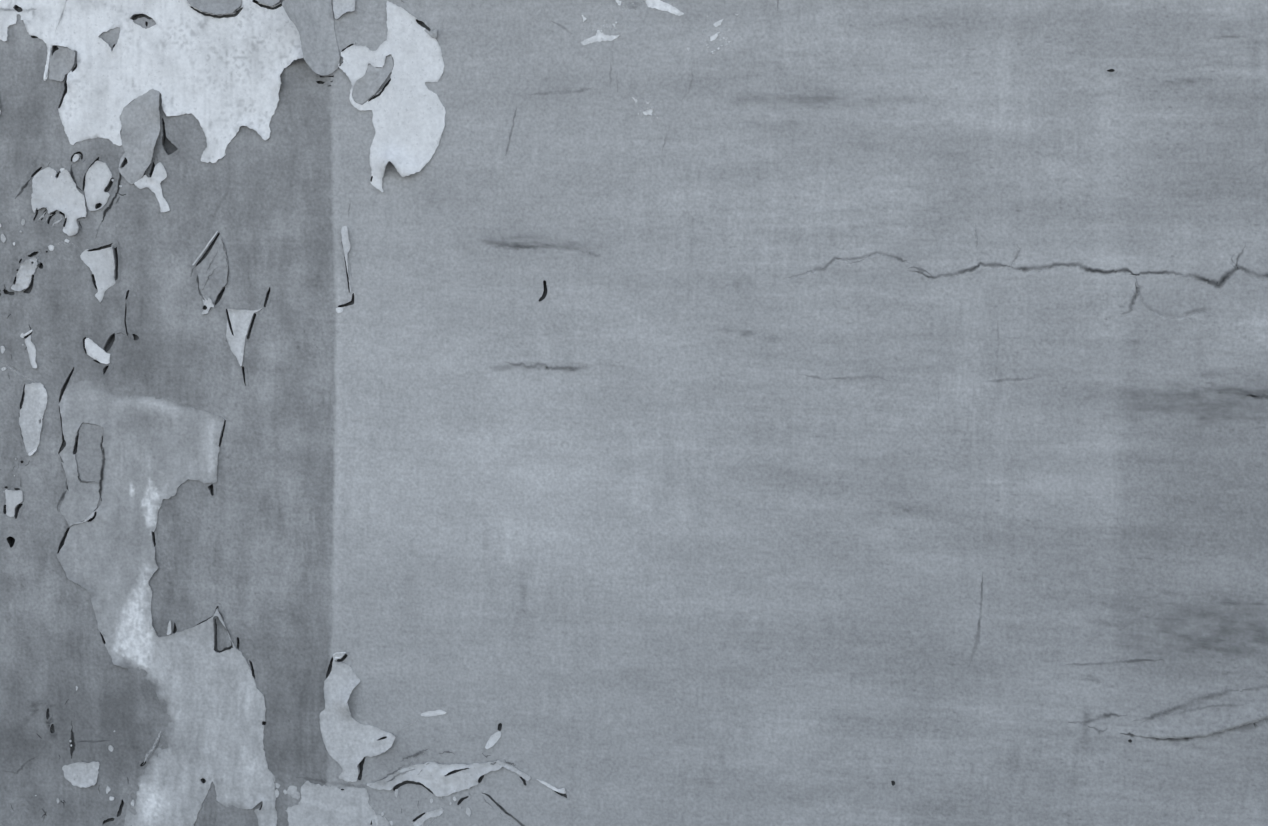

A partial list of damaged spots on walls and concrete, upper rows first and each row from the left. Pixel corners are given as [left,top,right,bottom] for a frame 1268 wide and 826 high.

peeling [0,0,446,313]
spalling [192,230,273,388]
crack [1085,268,1164,297]
crack [1201,273,1229,286]
peeling [0,325,570,826]